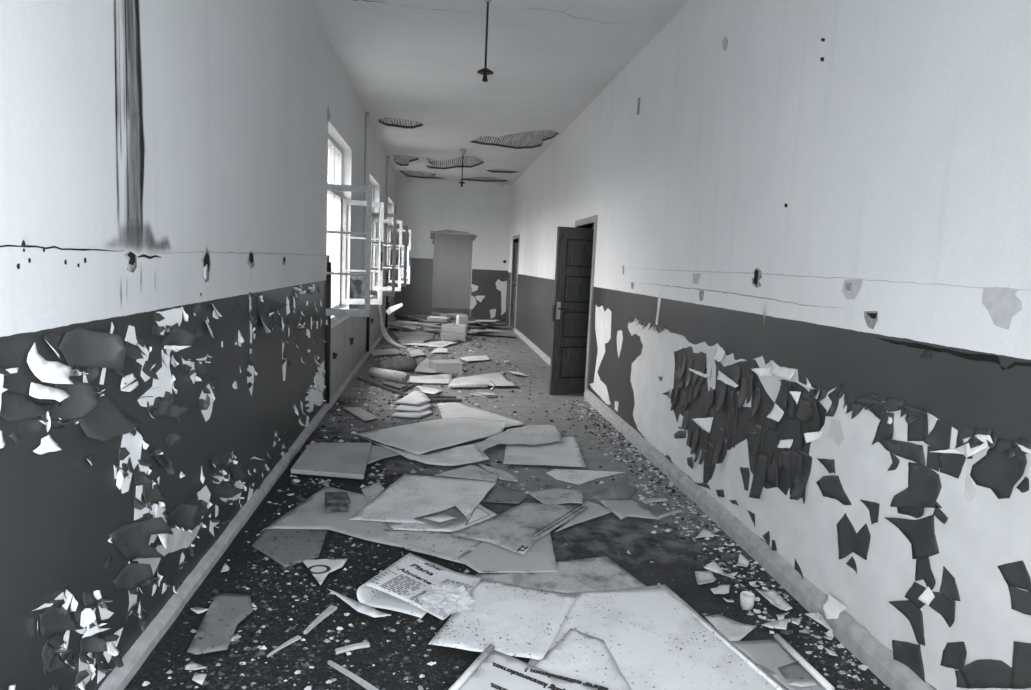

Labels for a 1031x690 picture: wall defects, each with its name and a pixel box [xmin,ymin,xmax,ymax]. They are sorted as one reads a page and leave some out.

damp [114,0,167,248]
spalling [377,117,424,129]
spalling [393,130,560,182]
spalling [201,247,211,283]
peeling [371,289,441,358]
peeling [470,279,507,331]
spalling [842,279,863,299]
spalling [982,287,1022,330]
peeling [0,284,368,690]
peeling [569,298,1031,690]